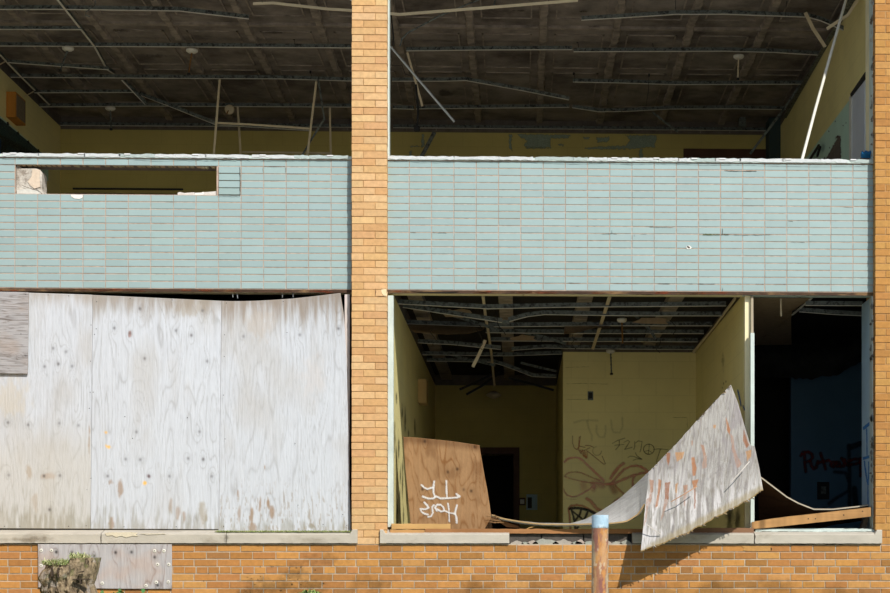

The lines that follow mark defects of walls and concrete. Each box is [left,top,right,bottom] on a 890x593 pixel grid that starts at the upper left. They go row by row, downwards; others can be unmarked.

peeling [388,95,873,164]
peeling [3,153,348,189]